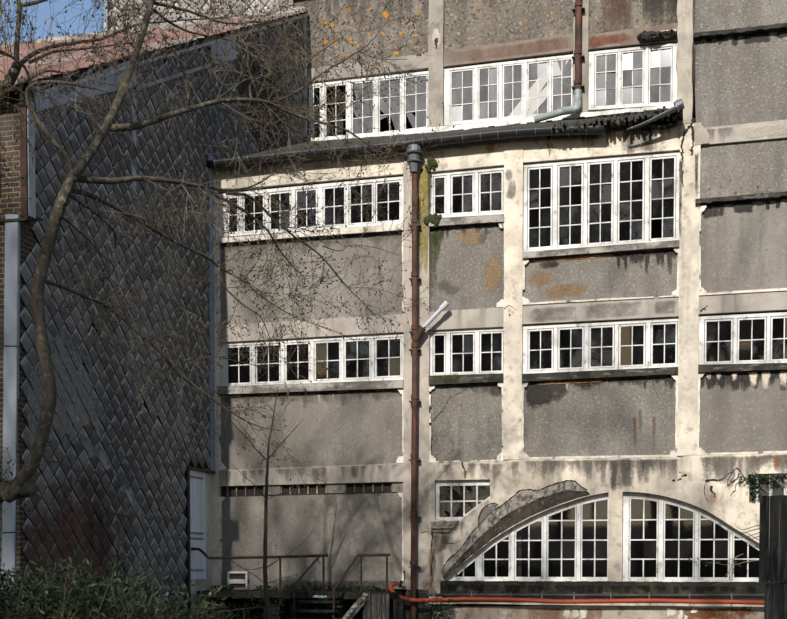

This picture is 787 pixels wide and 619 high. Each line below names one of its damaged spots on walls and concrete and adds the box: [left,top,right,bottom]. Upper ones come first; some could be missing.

water stain [643,0,695,23]
crack [680,118,695,188]
water stain [418,163,500,294]
water stain [529,248,676,272]
water stain [700,370,787,390]
water stain [512,459,677,488]
peeling [666,607,698,619]